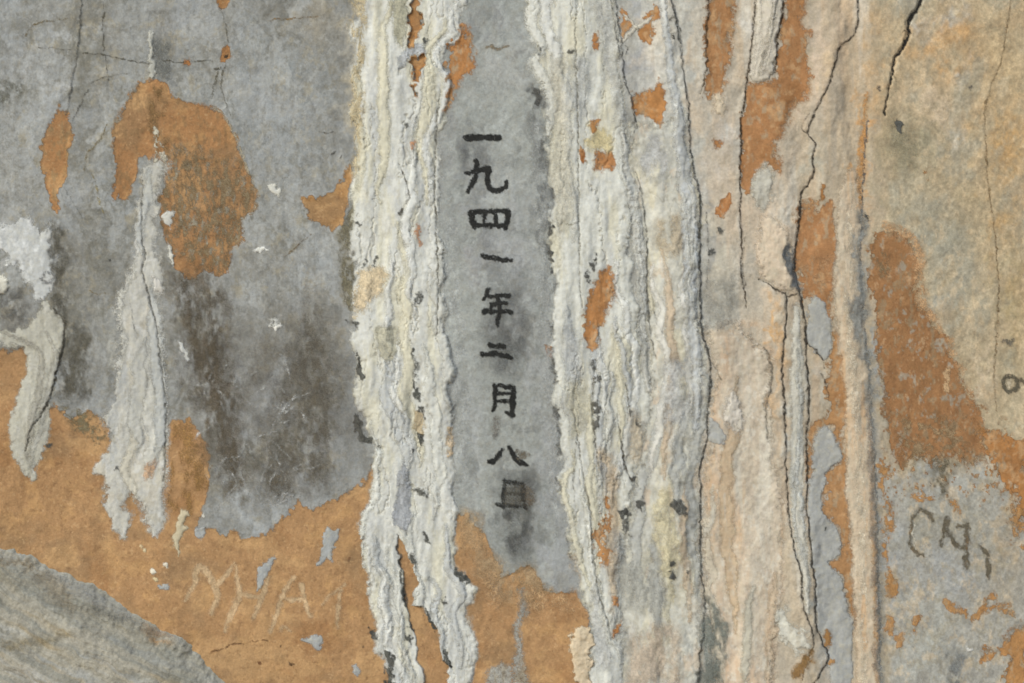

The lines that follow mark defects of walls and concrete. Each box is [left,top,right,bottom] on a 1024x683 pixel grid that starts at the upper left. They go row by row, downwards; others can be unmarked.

peeling [39,104,75,214]
peeling [111,78,281,280]
peeling [301,164,354,232]
crack [860,0,922,264]
crack [739,0,859,683]
peeling [805,296,833,360]
peeling [0,347,392,683]
peeling [396,536,450,683]
peeling [454,510,590,683]